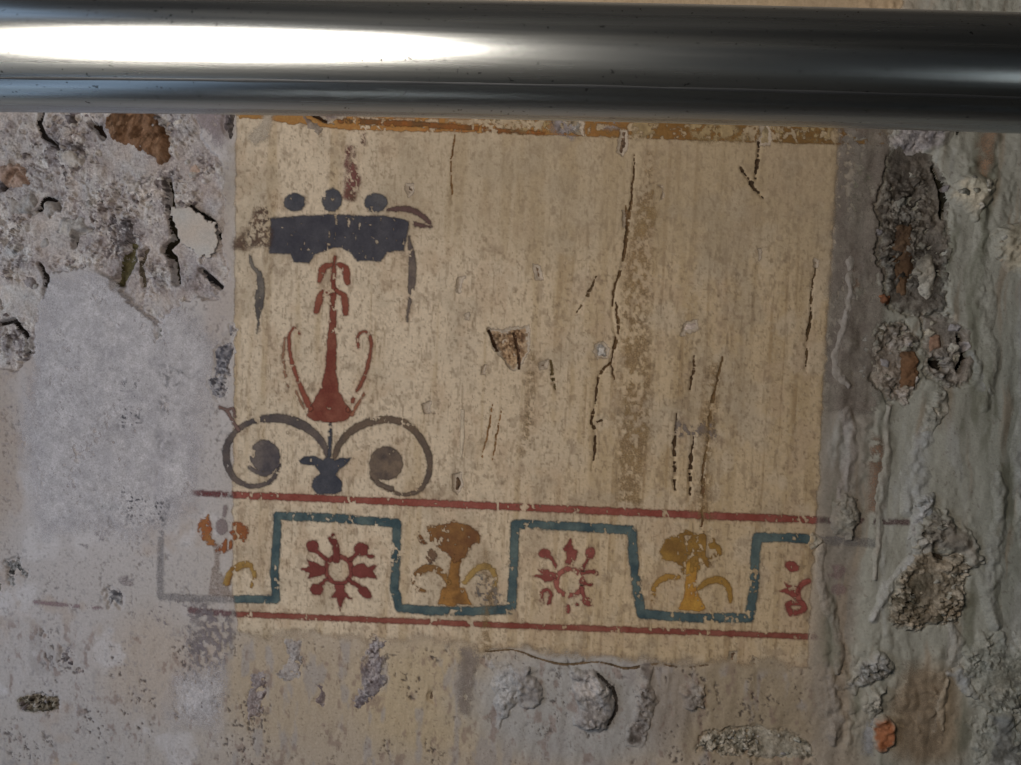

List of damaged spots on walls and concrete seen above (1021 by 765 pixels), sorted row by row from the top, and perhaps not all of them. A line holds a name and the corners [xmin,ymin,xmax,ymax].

spalling [0,112,231,372]
spalling [303,116,343,135]
spalling [487,328,529,370]
crack [576,155,635,461]
crack [740,141,764,199]
spalling [868,146,974,406]
crack [671,355,723,527]
water stain [807,128,1021,765]
spalling [887,550,971,632]